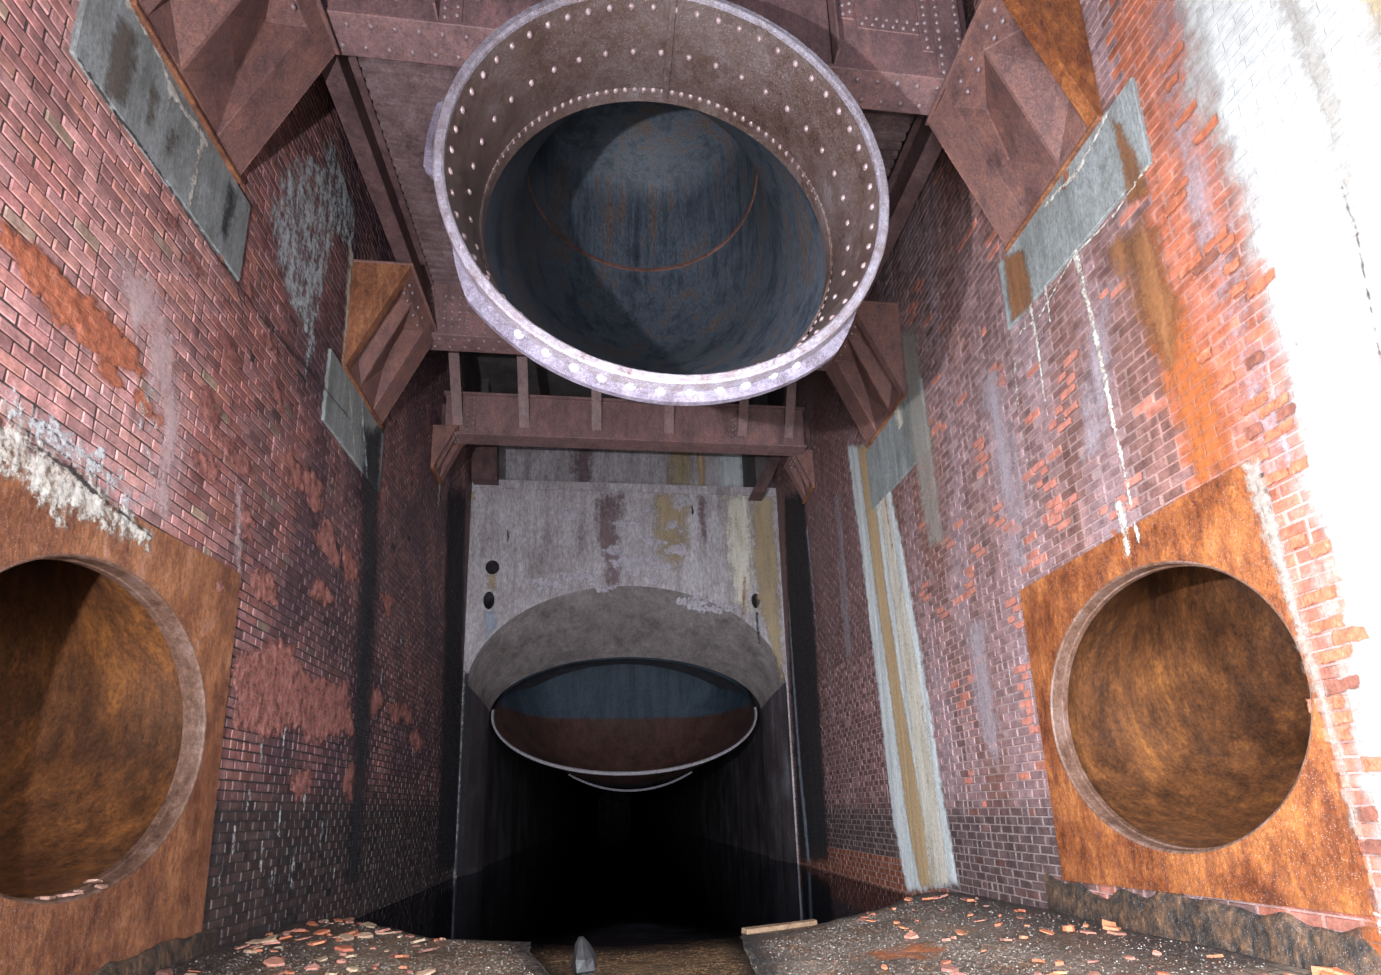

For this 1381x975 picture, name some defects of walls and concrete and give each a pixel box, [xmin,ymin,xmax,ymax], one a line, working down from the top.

water stain [1044,111,1109,209]
spalling [1193,113,1218,147]
spalling [1177,225,1275,299]
efflorescence [0,261,181,552]
water stain [1011,165,1149,568]
corrosion [1109,220,1229,485]
spalling [1239,391,1309,488]
spalling [1301,584,1370,742]
spalling [1361,756,1381,772]
spalling [1351,806,1378,822]
spalling [1360,839,1381,856]
corrosion [1361,912,1381,957]